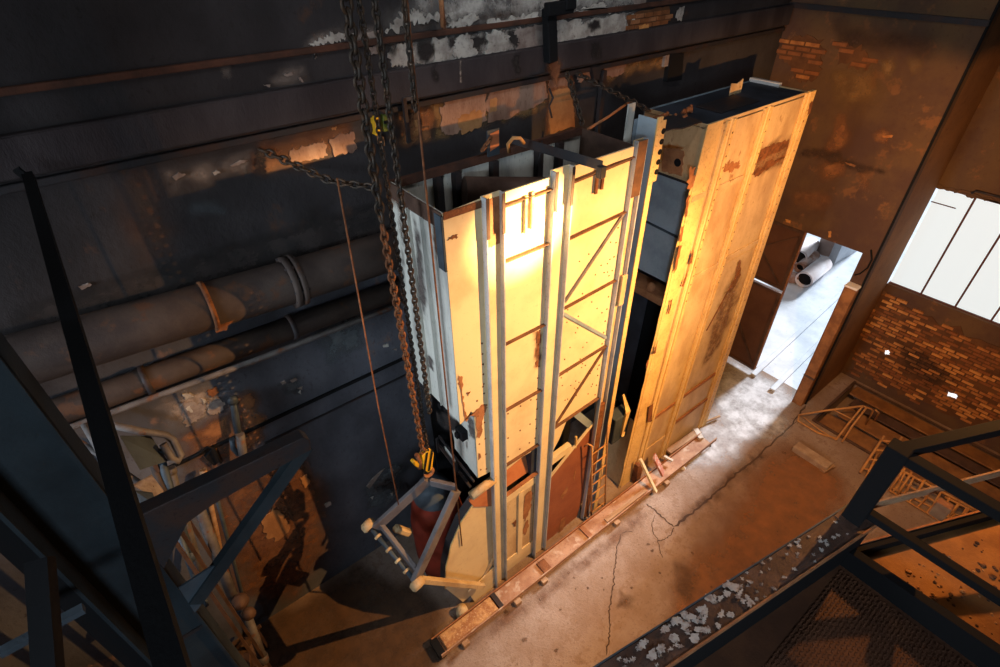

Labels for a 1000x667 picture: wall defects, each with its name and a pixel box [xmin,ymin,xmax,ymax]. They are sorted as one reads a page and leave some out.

peeling [309,0,559,68]
peeling [557,0,685,42]
flaking render [603,58,662,79]
spalling [776,34,879,83]
flaking render [399,72,591,145]
flaking render [230,124,357,172]
peeling [170,386,248,470]
spalling [217,468,279,540]
spalling [233,464,331,595]
crack [606,405,806,655]